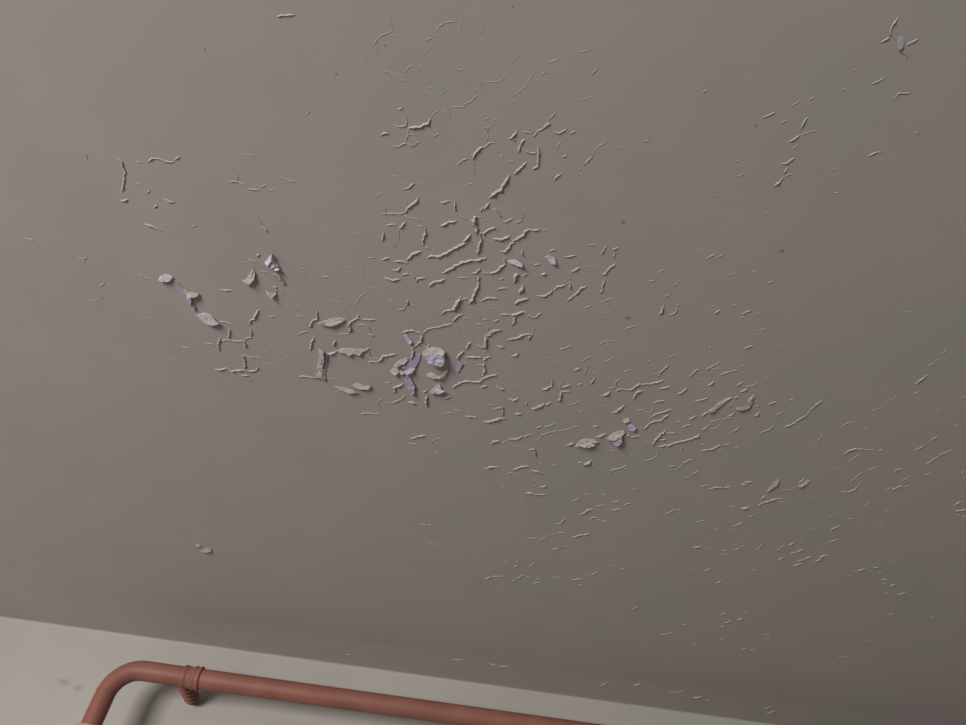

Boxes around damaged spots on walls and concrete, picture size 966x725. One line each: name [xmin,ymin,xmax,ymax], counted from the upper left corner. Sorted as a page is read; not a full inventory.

peeling [128,269,220,326]
peeling [238,253,295,299]
peeling [299,349,328,381]
peeling [394,334,448,379]
peeling [574,418,644,448]